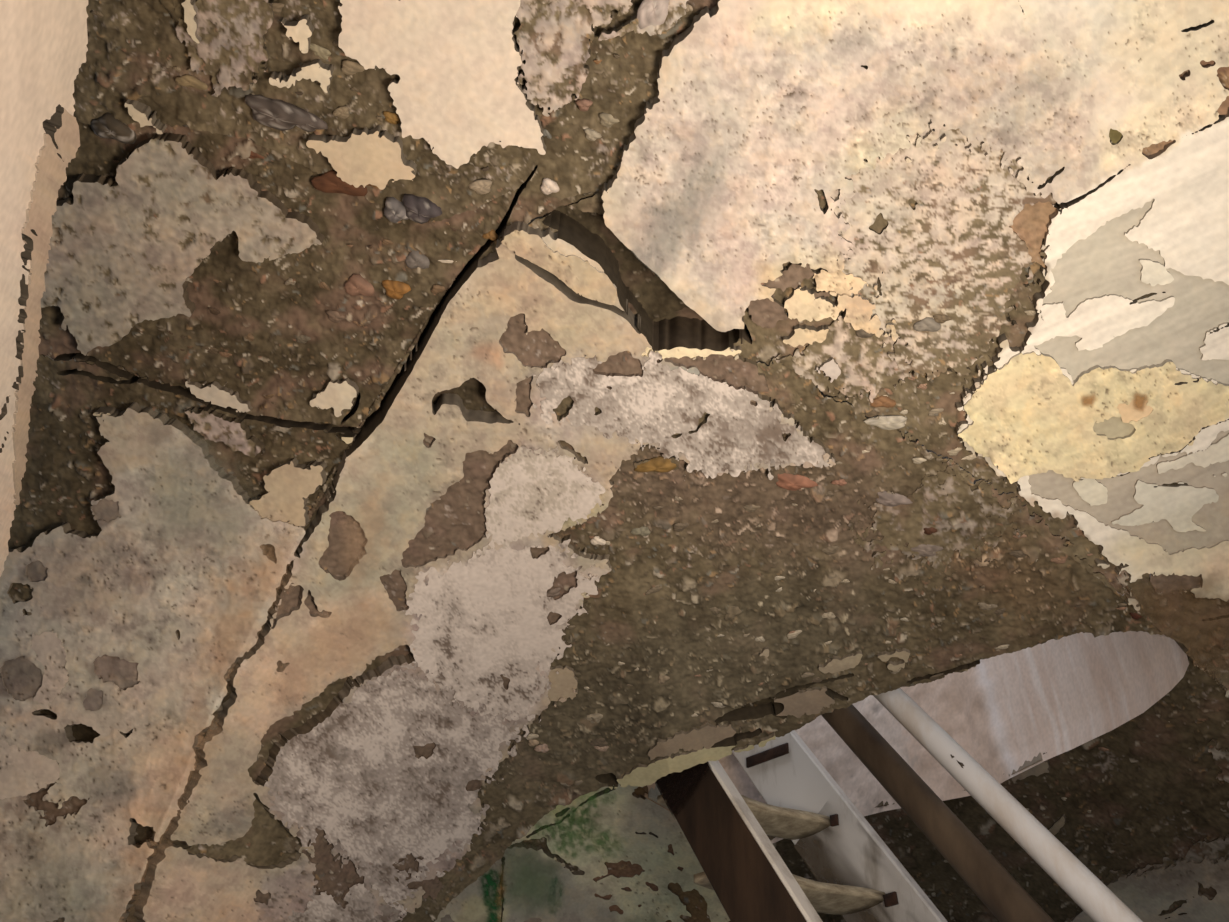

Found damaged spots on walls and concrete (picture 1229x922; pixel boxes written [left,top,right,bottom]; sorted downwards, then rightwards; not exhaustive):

spalling [1179,60,1229,117]
crack [0,229,38,453]
spalling [8,0,720,581]
crack [54,165,752,457]
spalling [380,112,1229,922]
crack [32,709,57,720]
spalling [23,780,89,827]
spalling [64,723,100,743]
crack [118,485,336,922]
spalling [186,645,415,909]
water stain [263,446,605,922]
crack [711,673,854,748]